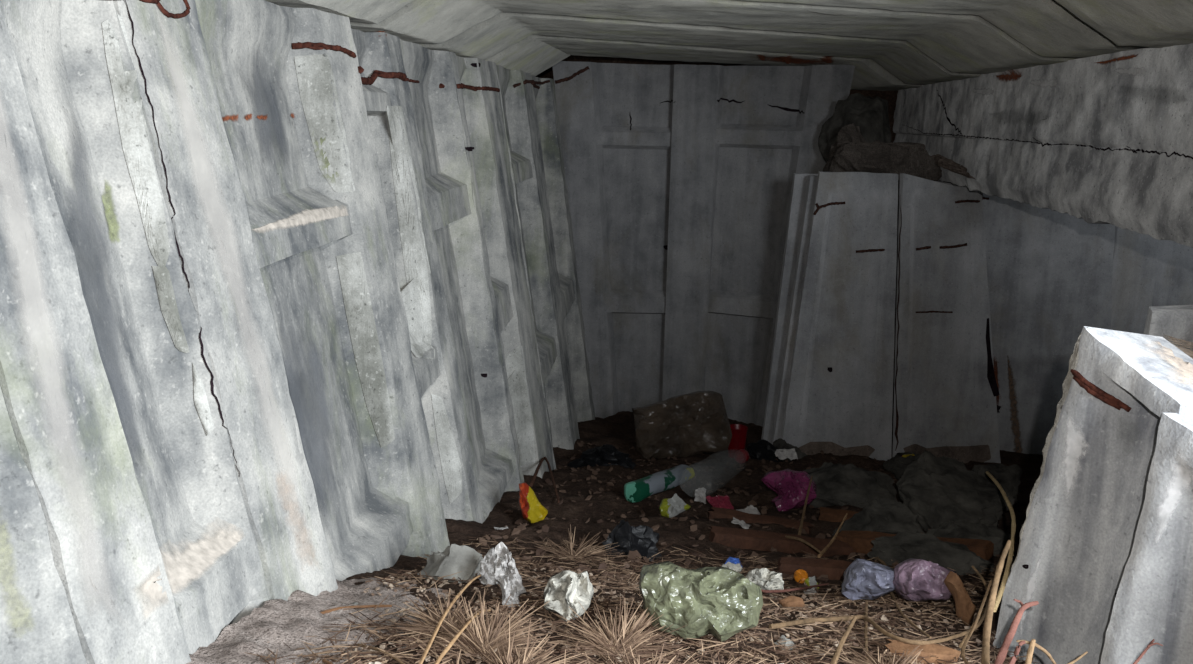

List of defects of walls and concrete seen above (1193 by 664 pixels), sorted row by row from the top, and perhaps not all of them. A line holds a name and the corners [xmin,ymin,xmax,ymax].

crack [125,0,191,297]
spalling [932,154,975,179]
crack [903,86,1193,159]
crack [199,327,240,477]